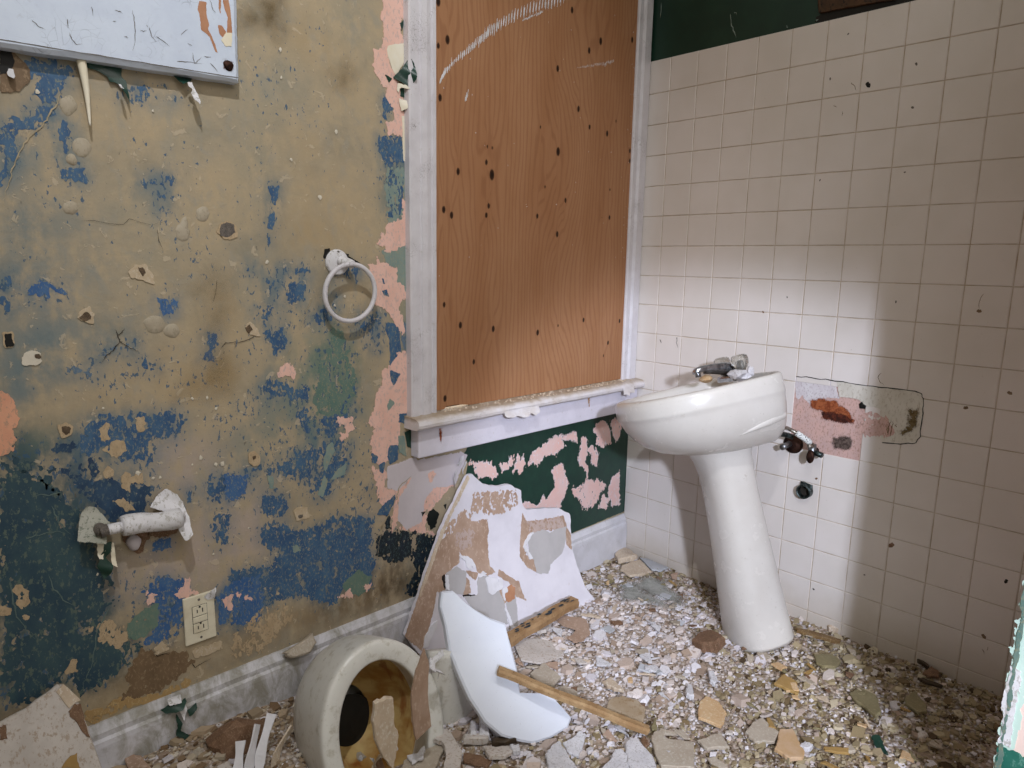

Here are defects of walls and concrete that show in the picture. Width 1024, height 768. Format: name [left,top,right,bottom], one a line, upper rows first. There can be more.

spalling [0,50,31,93]
peeling [87,63,130,103]
peeling [173,75,201,104]
peeling [393,59,417,111]
peeling [0,105,55,187]
spalling [216,221,238,240]
spalling [2,331,42,366]
peeling [791,377,865,461]
flaking render [99,422,144,512]
peeling [457,417,622,511]
flaking render [0,584,30,620]
flaking render [56,595,293,739]